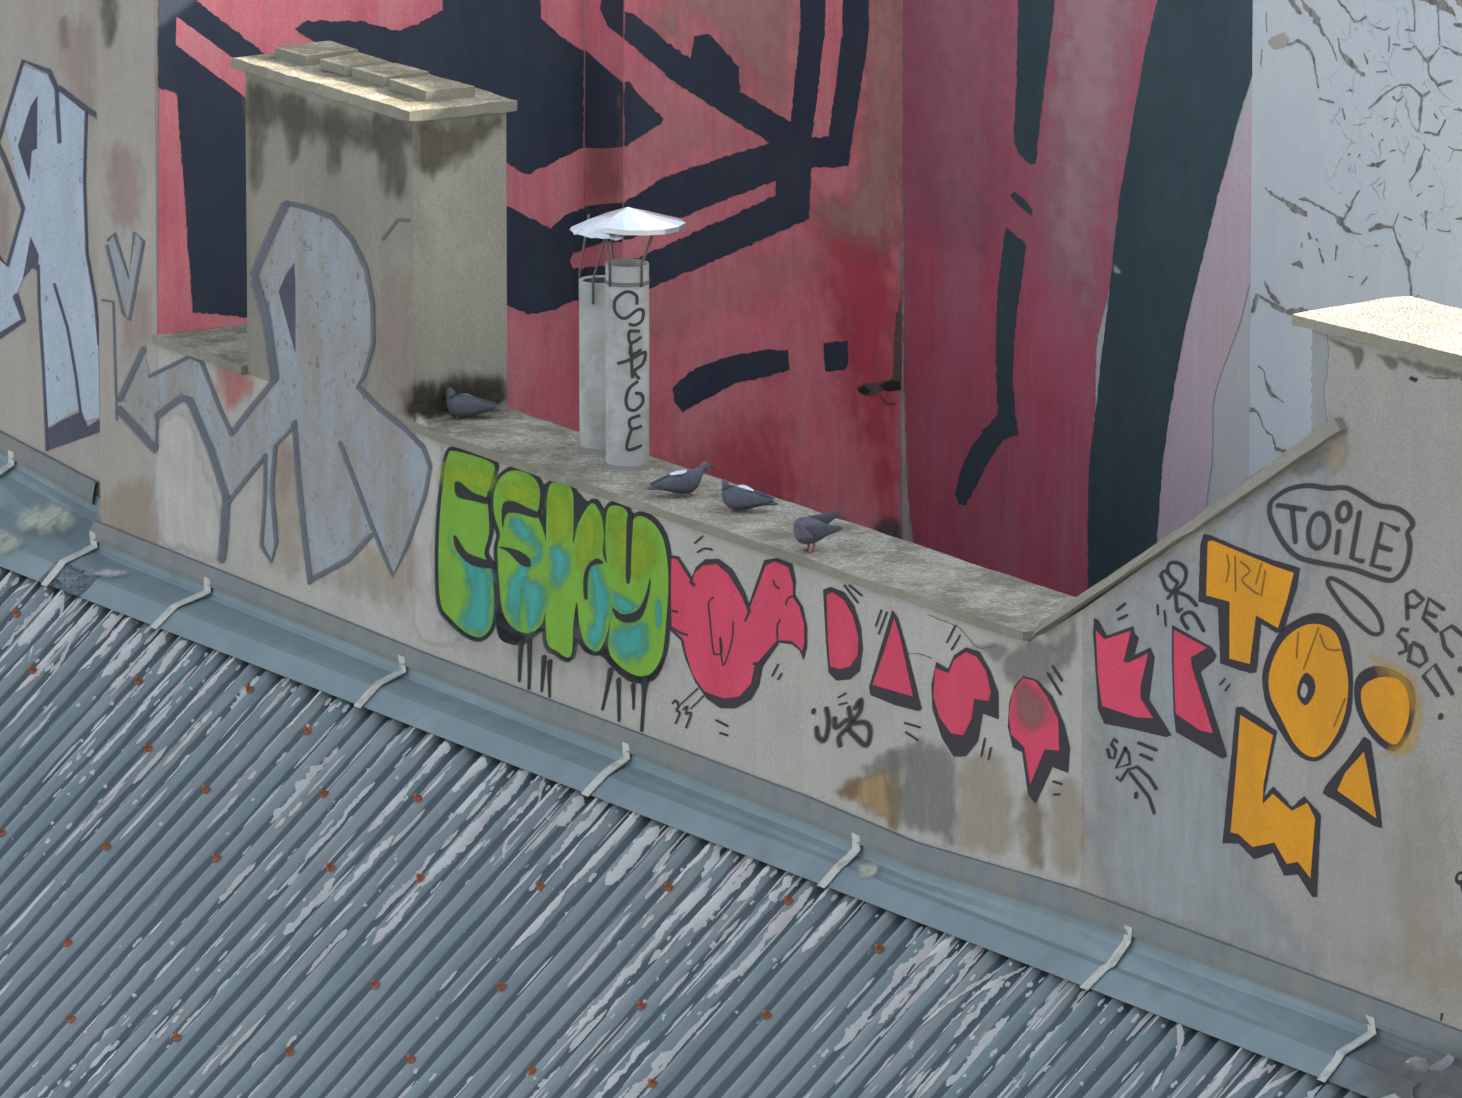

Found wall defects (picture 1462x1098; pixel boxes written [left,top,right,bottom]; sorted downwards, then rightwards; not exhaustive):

damp [248,87,500,195]
crack [1251,0,1462,315]
damp [404,377,504,417]
crack [1249,365,1287,453]
peeling [0,569,878,1098]
peeling [812,927,1322,1098]